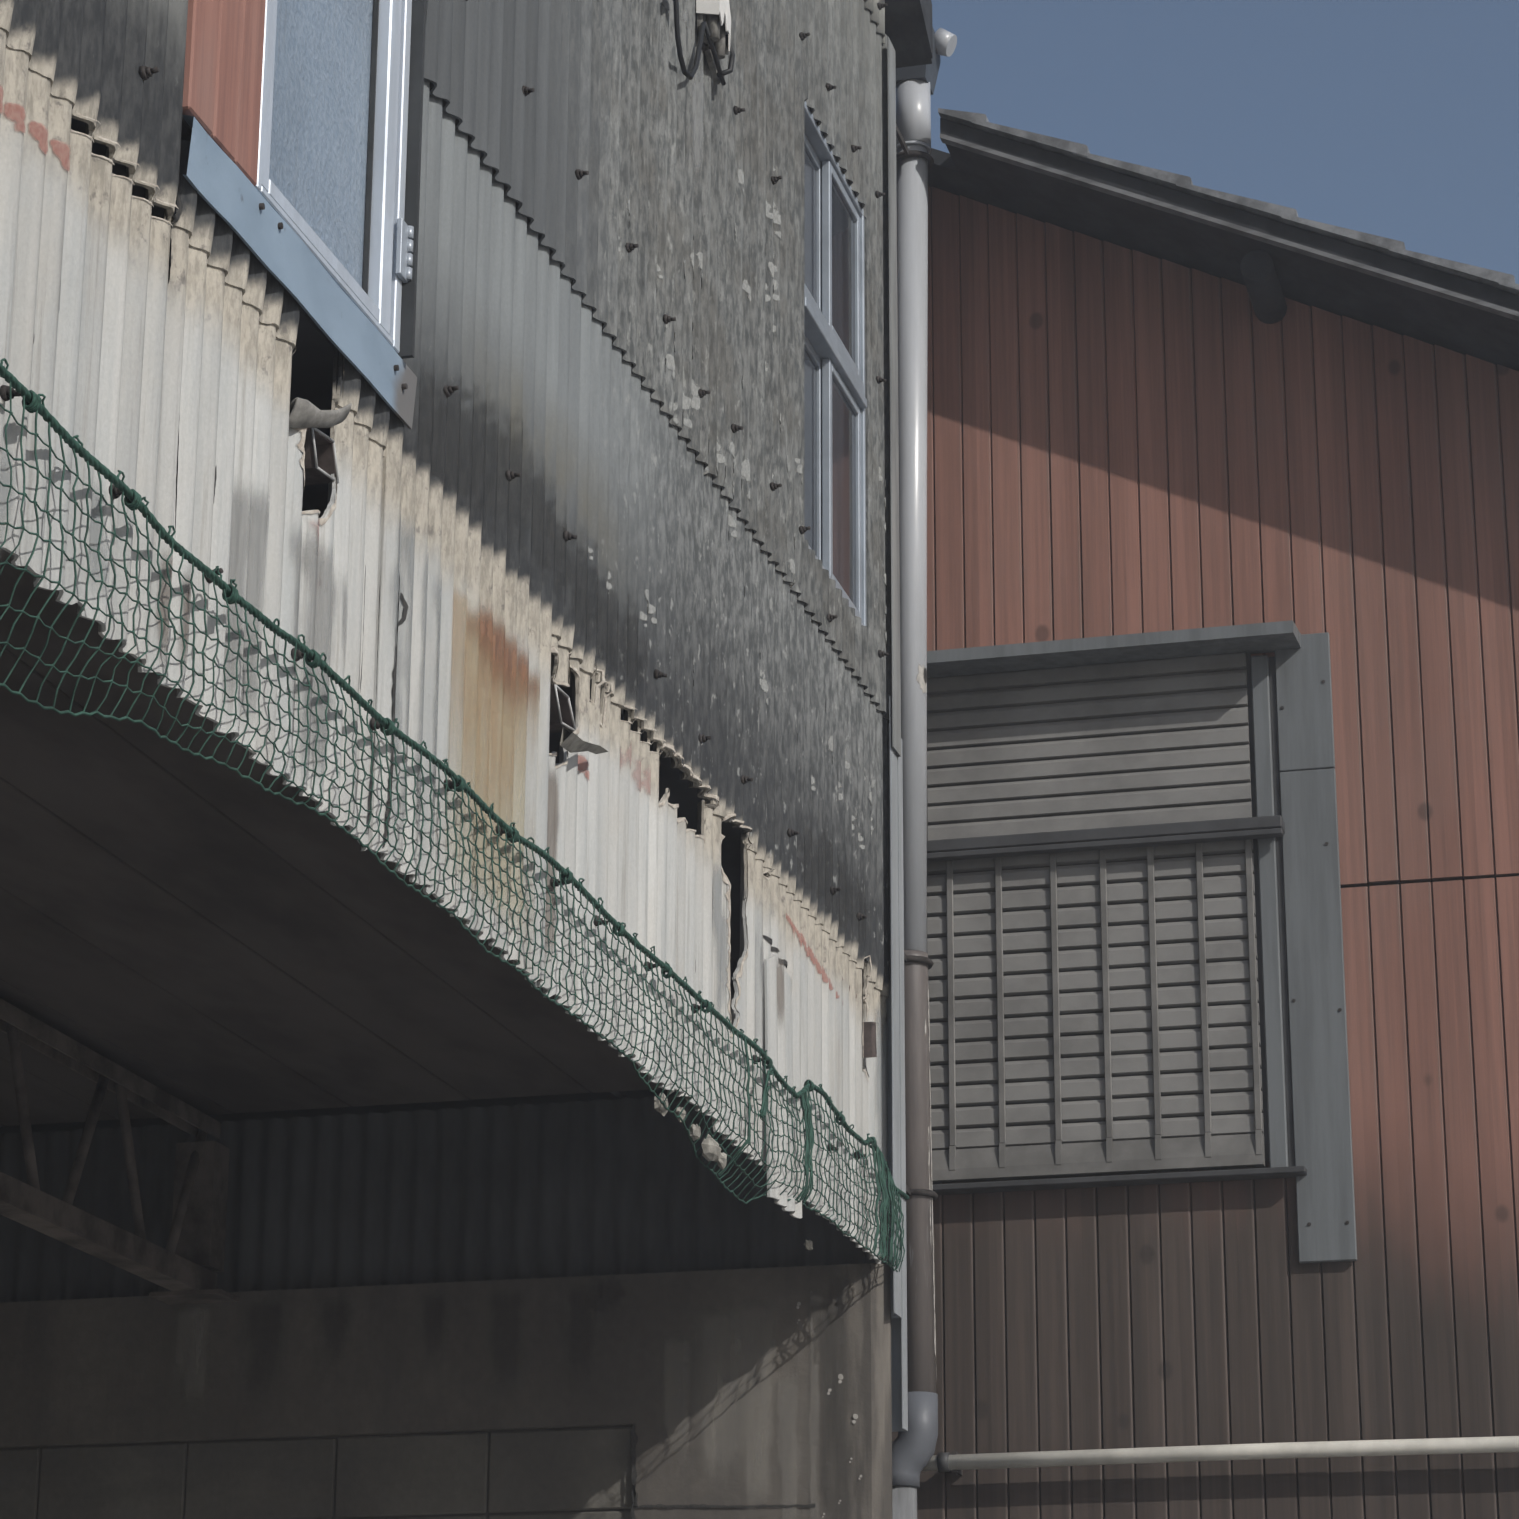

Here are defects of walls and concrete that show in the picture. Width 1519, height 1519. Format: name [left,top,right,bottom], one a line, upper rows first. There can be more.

spalling [292,428,307,491]
spalling [302,475,337,526]
damp [224,498,269,694]
damp [293,520,348,751]
rust [478,614,529,691]
spalling [551,646,581,690]
spalling [659,743,752,1037]